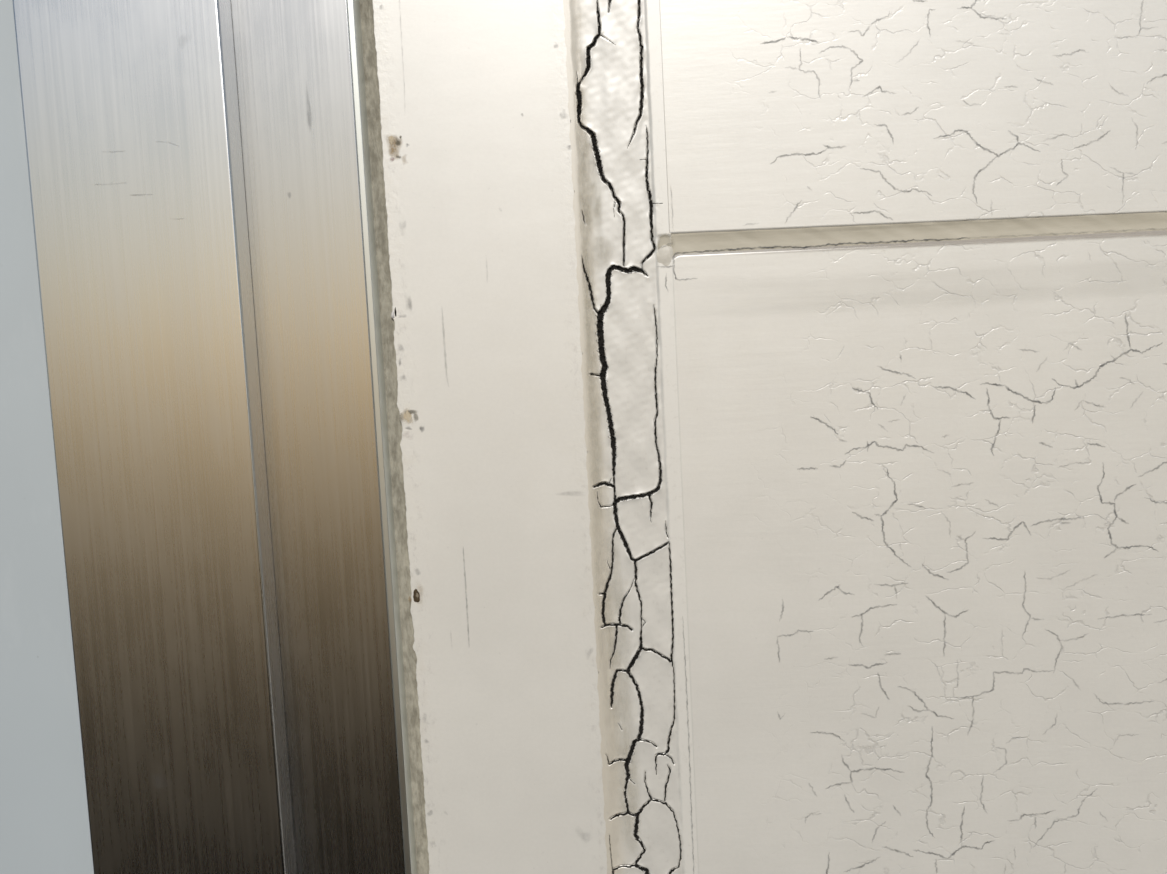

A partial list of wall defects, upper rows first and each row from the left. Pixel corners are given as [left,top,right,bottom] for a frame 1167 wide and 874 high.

crack [576,0,967,874]